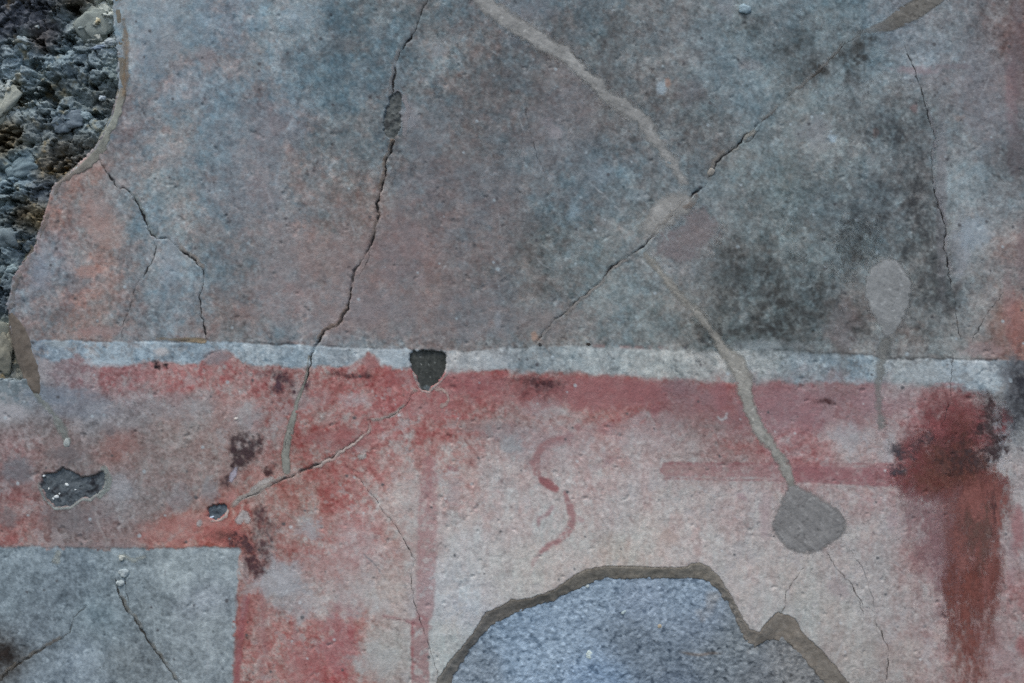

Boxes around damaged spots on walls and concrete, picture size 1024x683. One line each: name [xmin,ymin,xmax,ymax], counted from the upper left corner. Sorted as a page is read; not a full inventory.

crack [389,0,428,94]
crack [538,39,853,340]
crack [905,47,951,284]
crack [105,170,206,336]
crack [303,139,394,389]
spalling [39,466,112,510]
spalling [197,504,250,526]
crack [232,389,416,506]
crack [115,579,179,683]
spalling [452,577,824,683]